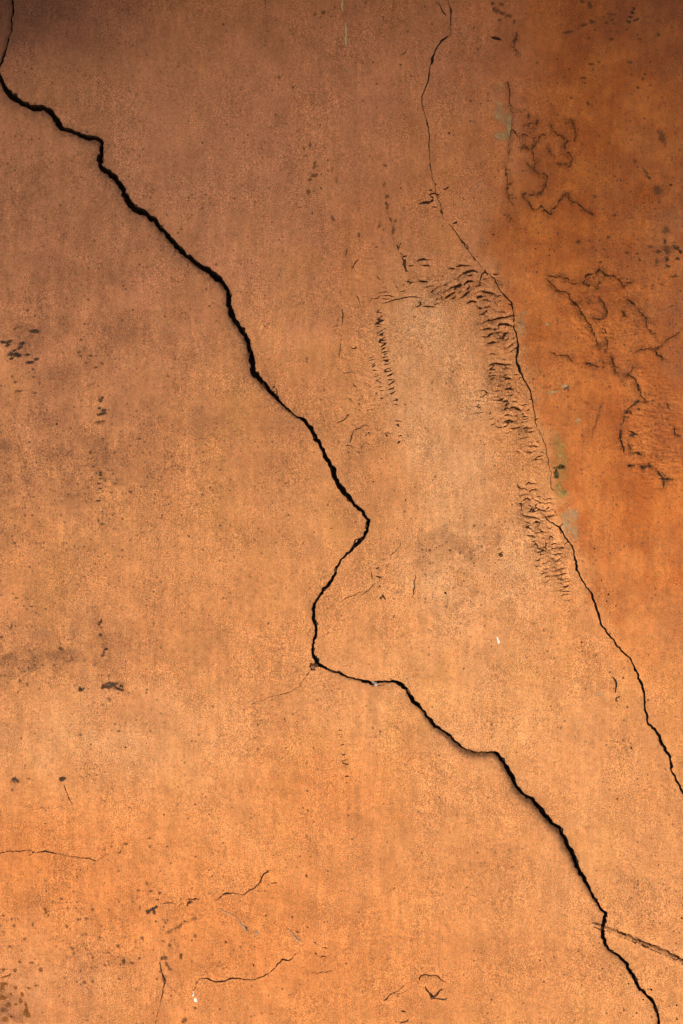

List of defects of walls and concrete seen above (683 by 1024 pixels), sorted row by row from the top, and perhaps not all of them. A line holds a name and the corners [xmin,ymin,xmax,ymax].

crack [0,0,14,67]
crack [421,2,555,491]
crack [0,72,476,753]
crack [543,514,683,795]
crack [0,847,123,861]
crack [155,928,332,1023]
crack [215,870,277,934]
crack [480,751,660,1024]